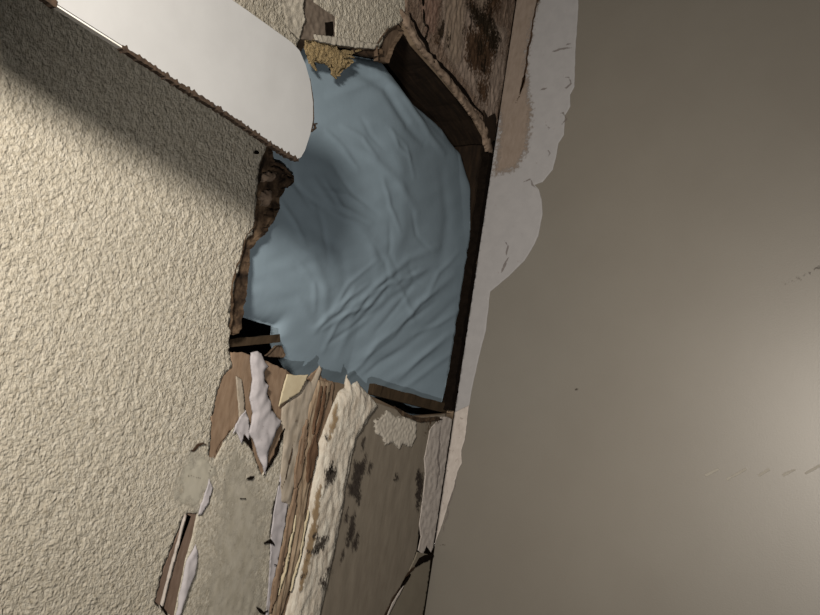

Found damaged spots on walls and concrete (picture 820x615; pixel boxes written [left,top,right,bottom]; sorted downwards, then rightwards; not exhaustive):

damp [422,0,508,117]
spalling [229,147,294,335]
spalling [264,345,286,358]
peeling [320,0,578,615]
damp [325,402,338,440]
damp [299,460,337,592]
mould [340,437,373,562]
crack [384,544,444,615]
damp [415,471,423,511]